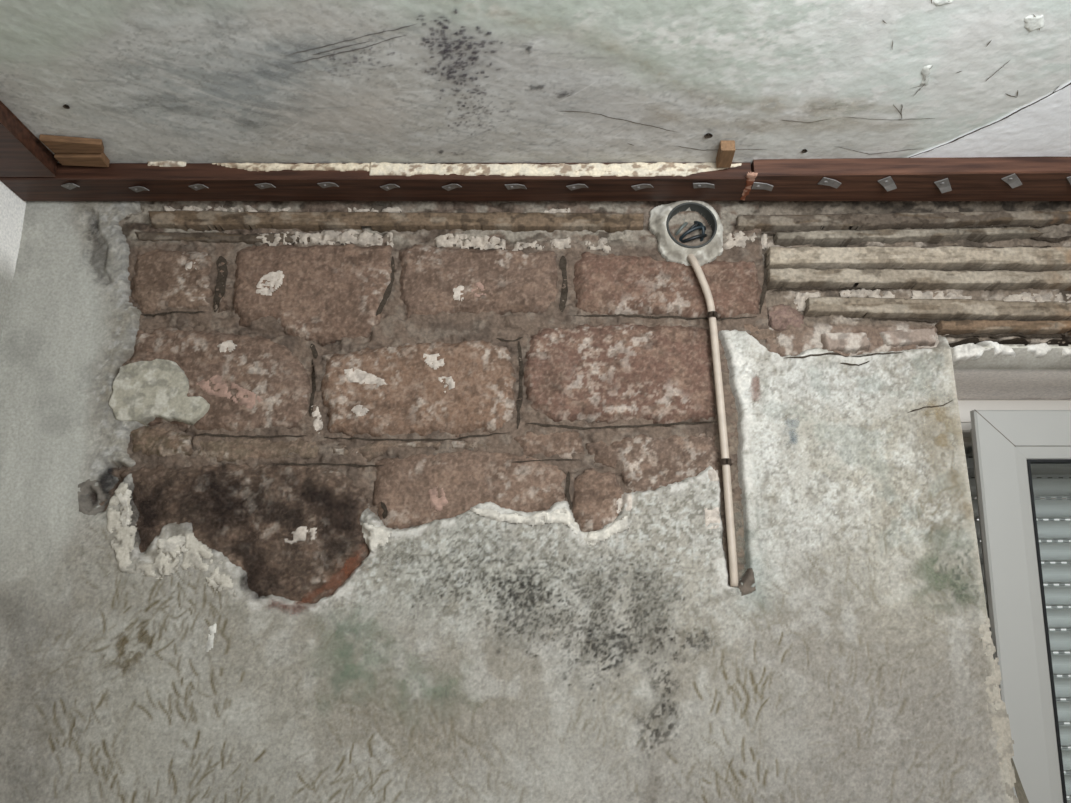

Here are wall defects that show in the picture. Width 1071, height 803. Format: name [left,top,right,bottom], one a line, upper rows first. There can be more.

leakage [423,10,495,107]
spalling [78,200,1071,604]
leakage [441,560,656,676]